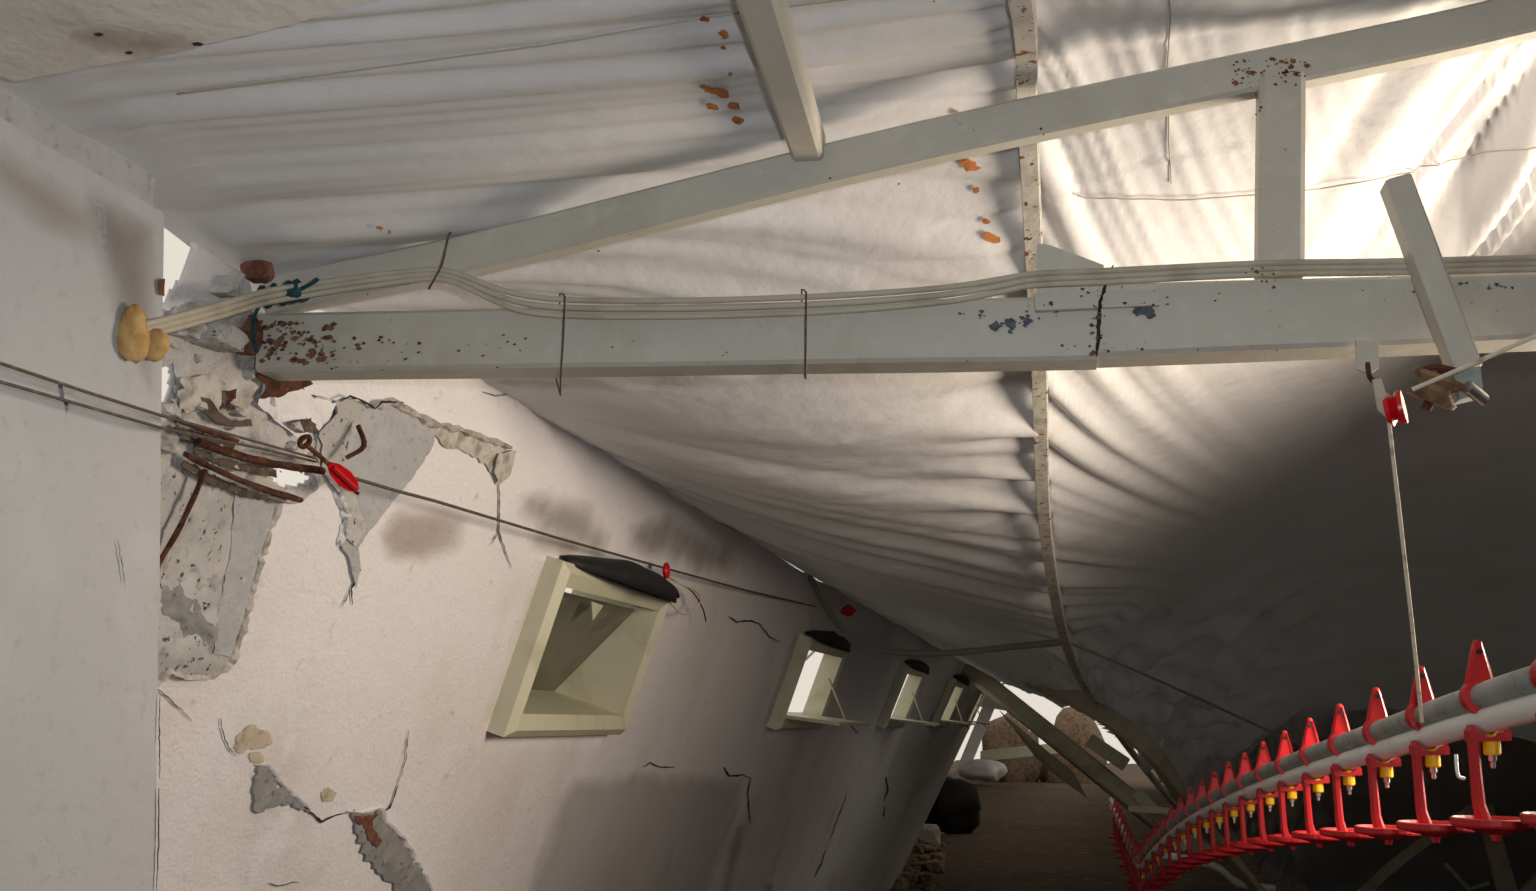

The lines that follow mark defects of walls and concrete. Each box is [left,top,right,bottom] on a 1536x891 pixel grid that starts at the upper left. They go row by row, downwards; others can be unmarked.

rust [700,72,744,124]
rust [1232,57,1310,115]
rust [959,159,981,194]
rust [981,219,1001,243]
spalling [158,278,252,329]
rust [256,319,421,371]
rust [1061,288,1146,356]
flaking render [158,335,516,687]
crack [156,689,236,888]
crack [304,807,346,823]
flaking render [234,725,434,891]
crack [386,730,409,811]